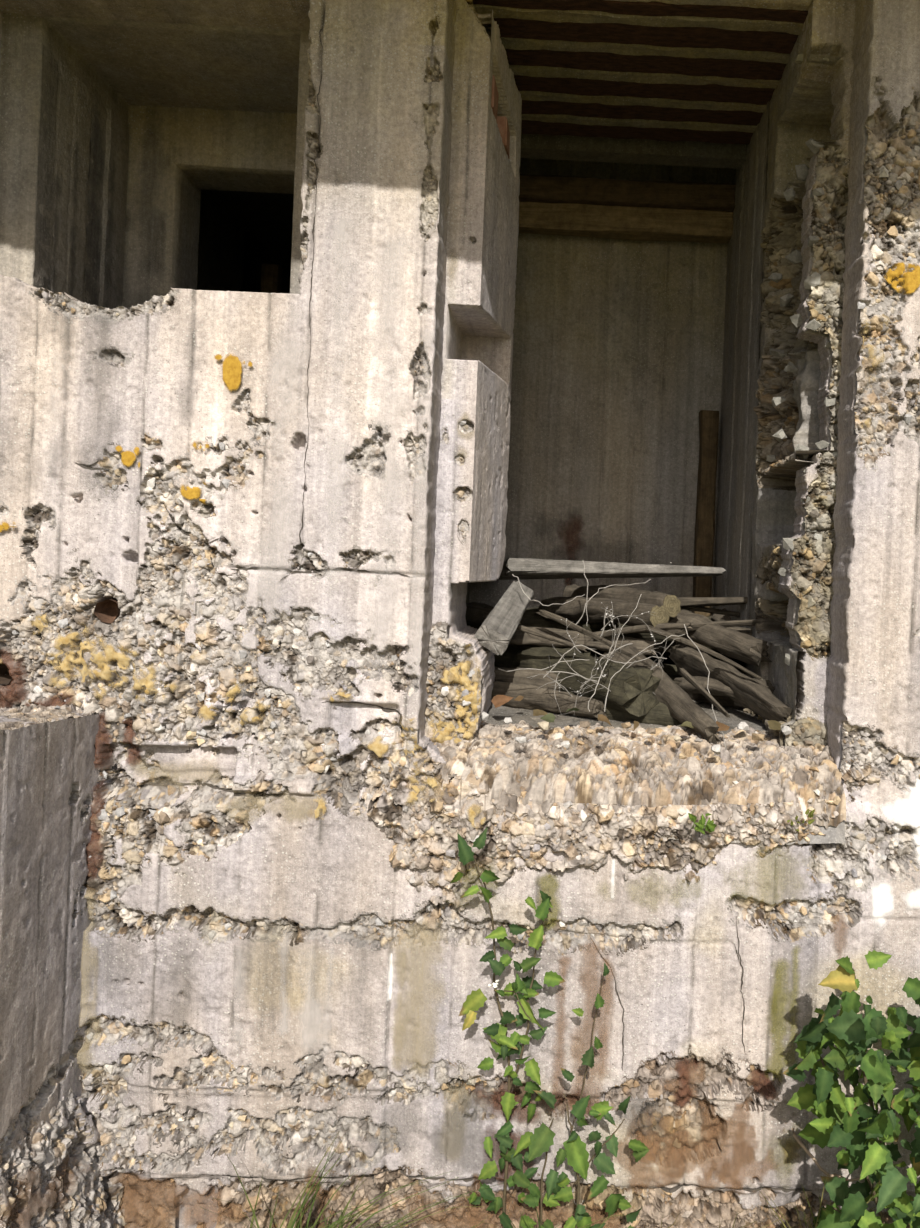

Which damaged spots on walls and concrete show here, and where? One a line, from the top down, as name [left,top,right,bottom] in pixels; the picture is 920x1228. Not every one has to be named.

spalling [423,15,444,84]
spalling [298,131,323,288]
spalling [418,101,440,242]
spalling [344,339,476,486]
spalling [417,304,432,319]
spalling [753,73,920,661]
rust [0,651,73,708]
spalling [0,388,920,957]
crack [591,939,624,1070]
crack [734,921,745,1050]
spalling [0,1013,841,1228]
rust [750,1069,776,1099]